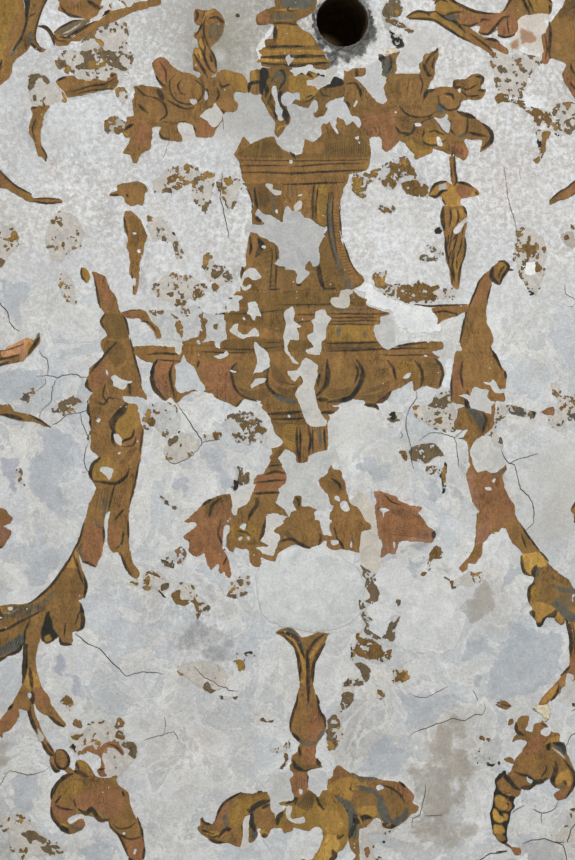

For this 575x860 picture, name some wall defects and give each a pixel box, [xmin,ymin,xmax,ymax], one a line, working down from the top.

peeling [354,0,414,104]
peeling [490,13,575,163]
peeling [351,136,430,198]
peeling [244,200,326,284]
peeling [148,252,270,393]
peeling [283,289,353,427]
peeling [111,375,340,555]
crack [401,392,467,469]
crack [501,449,536,530]
crack [77,634,161,676]
crack [409,691,485,737]
crack [477,803,575,860]